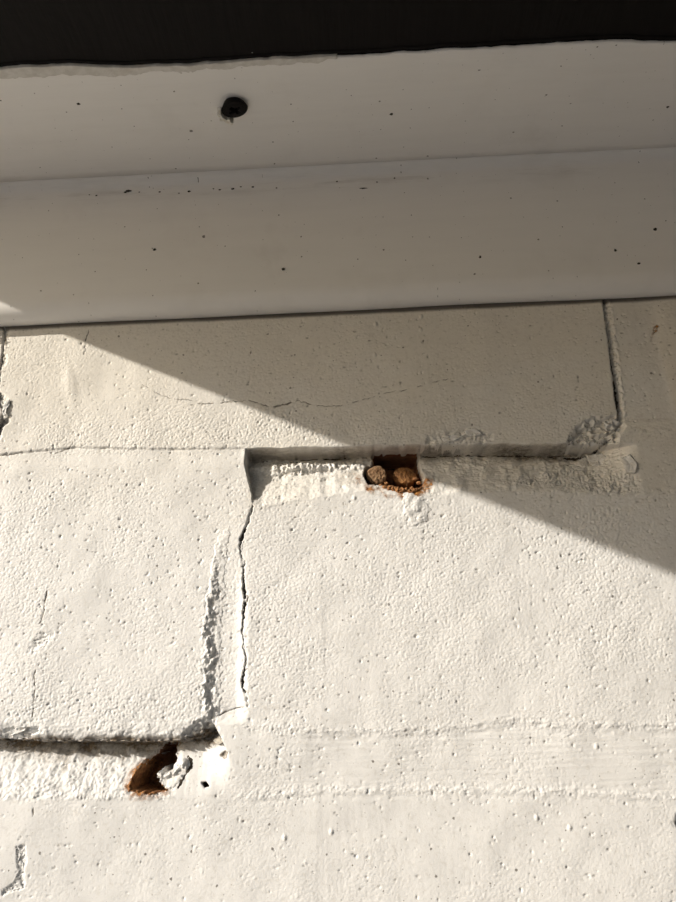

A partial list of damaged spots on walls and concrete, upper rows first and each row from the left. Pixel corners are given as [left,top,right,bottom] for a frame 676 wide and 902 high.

crack [0,327,23,456]
rust [399,478,433,498]
crack [213,505,254,747]
spalling [182,717,228,759]
spalling [127,763,168,795]